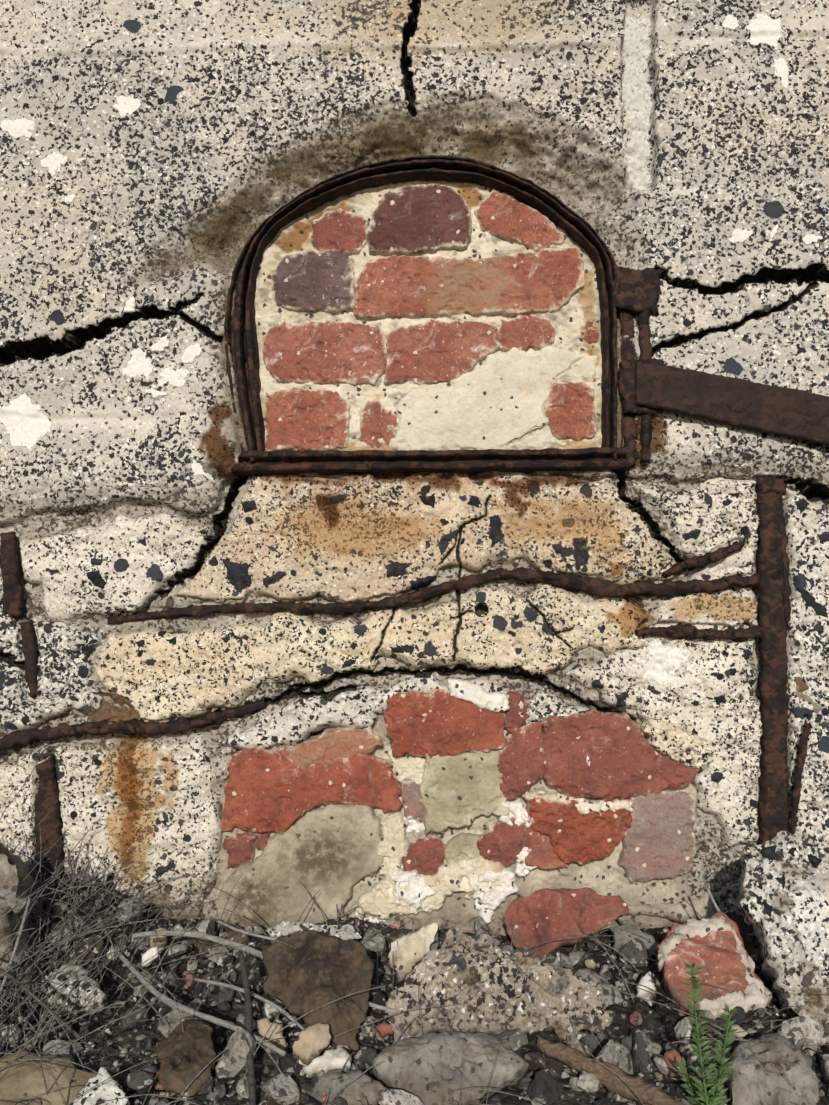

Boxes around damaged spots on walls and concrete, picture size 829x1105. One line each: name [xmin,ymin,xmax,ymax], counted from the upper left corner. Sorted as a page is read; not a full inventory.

crack [400,0,421,117]
crack [0,293,223,367]
crack [651,263,829,356]
corrosion [203,405,234,477]
crack [154,477,248,598]
crack [615,471,694,571]
crack [781,475,829,505]
flaking render [0,472,769,1105]
peeling [801,1038,829,1063]